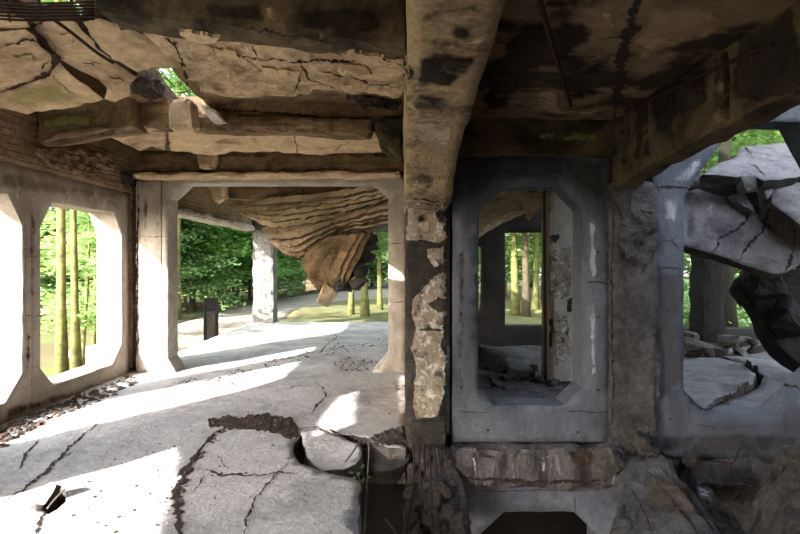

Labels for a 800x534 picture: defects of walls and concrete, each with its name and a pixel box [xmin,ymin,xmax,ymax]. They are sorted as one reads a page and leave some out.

crack [0,18,73,94]
crack [230,24,400,94]
damp [419,54,473,86]
damp [483,23,594,114]
damp [637,10,719,52]
damp [734,8,800,102]
damp [667,202,675,220]
flaking render [406,202,448,419]
flaking render [549,234,573,366]
crack [684,357,758,429]
crack [2,420,103,503]
crack [169,427,294,534]